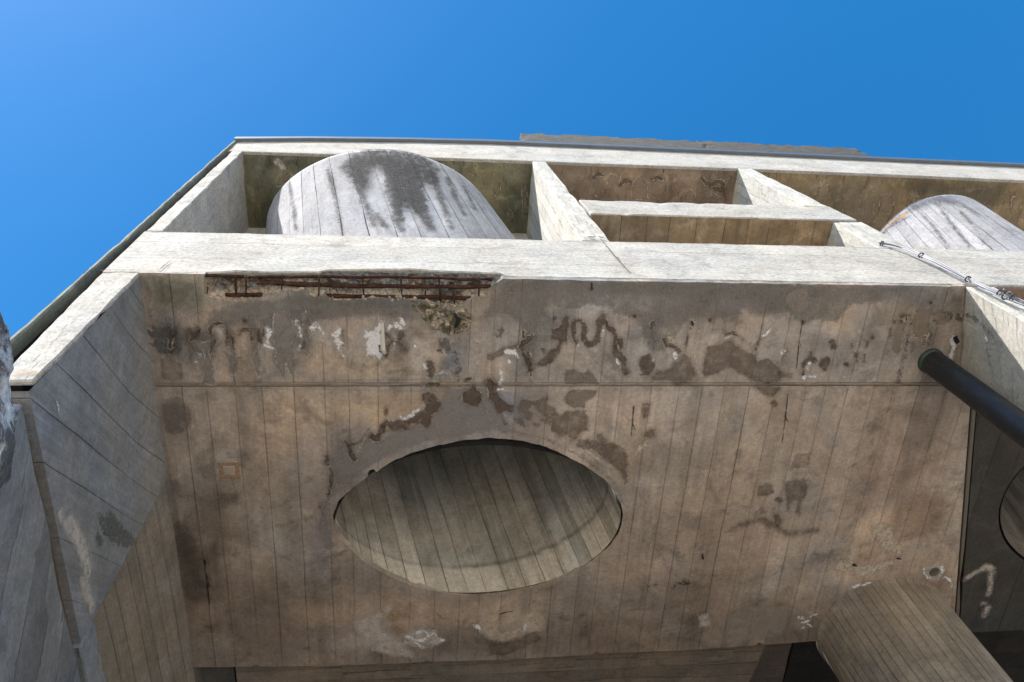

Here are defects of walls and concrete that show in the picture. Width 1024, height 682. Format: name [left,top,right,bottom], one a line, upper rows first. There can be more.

damp [326,149,476,231]
spalling [204,271,501,335]
damp [147,281,888,548]
damp [58,511,137,611]